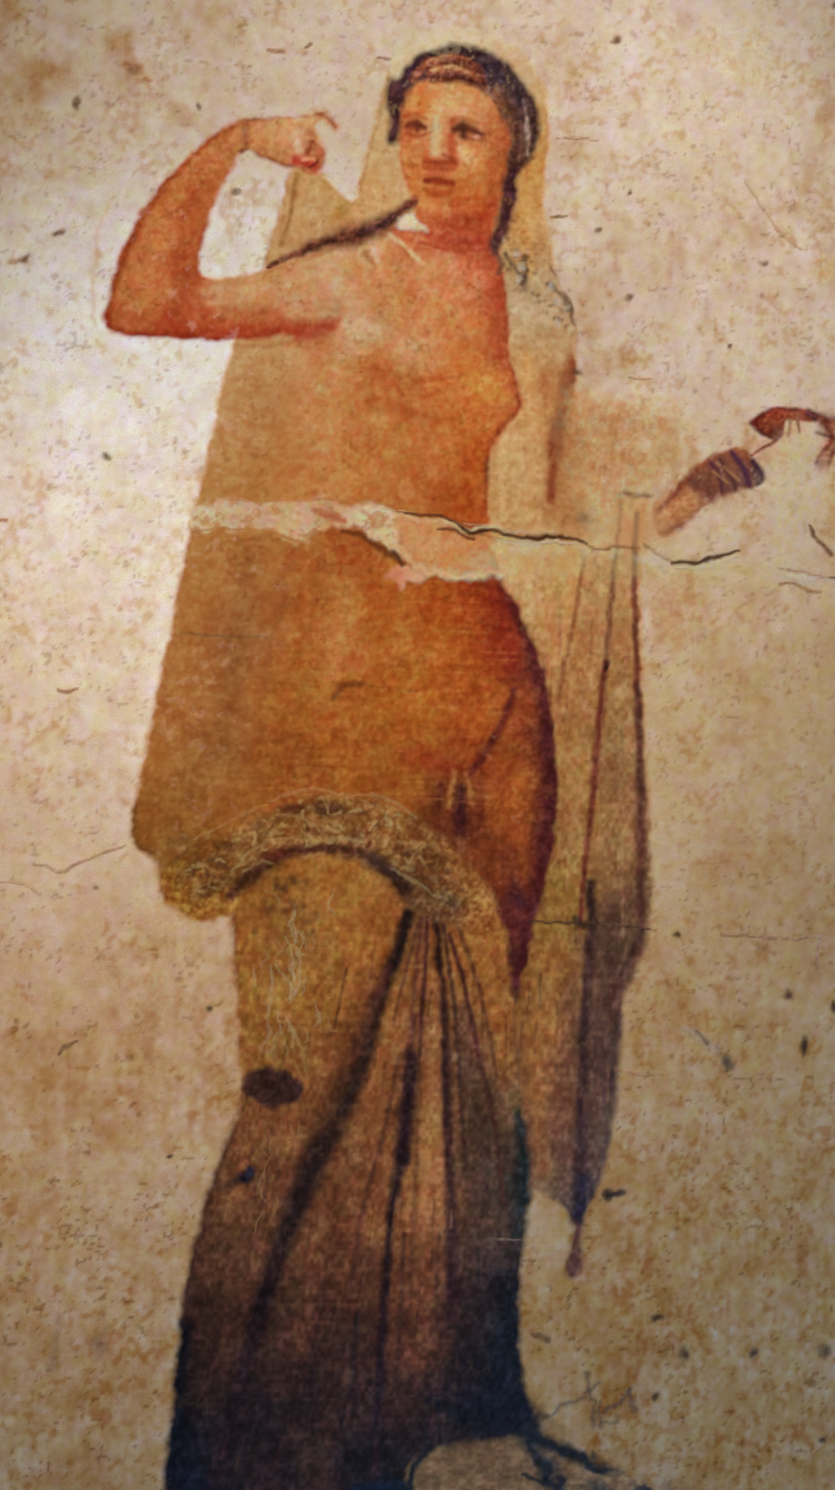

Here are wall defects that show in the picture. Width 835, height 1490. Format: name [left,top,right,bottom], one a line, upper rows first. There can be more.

flaking render [190,497,506,588]
crack [397,511,587,544]
crack [671,550,740,565]
crack [780,524,835,593]